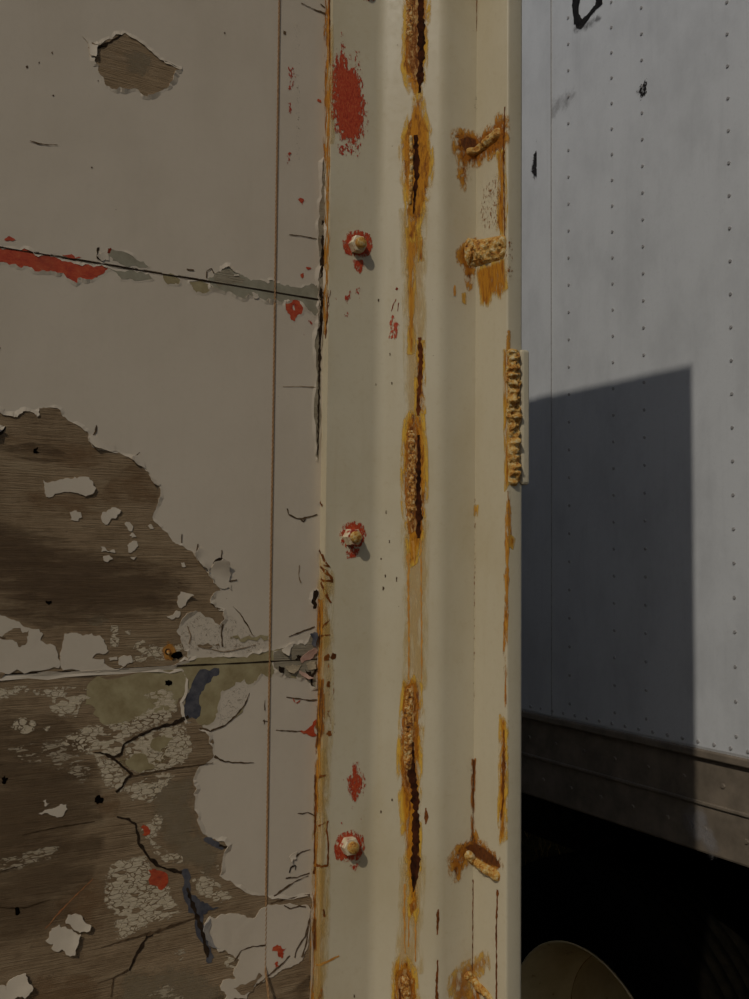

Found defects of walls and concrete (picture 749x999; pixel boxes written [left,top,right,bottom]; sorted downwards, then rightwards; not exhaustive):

peeling [82,30,182,100]
peeling [0,157,327,463]
peeling [317,32,368,156]
corrosion [452,107,513,305]
corrosion [391,0,434,999]
corrosion [503,330,515,651]
peeling [0,404,318,999]
crack [94,715,254,997]
crack [276,697,317,737]
corrosion [310,549,339,999]
corrosion [435,880,499,999]
corrosion [448,715,509,882]